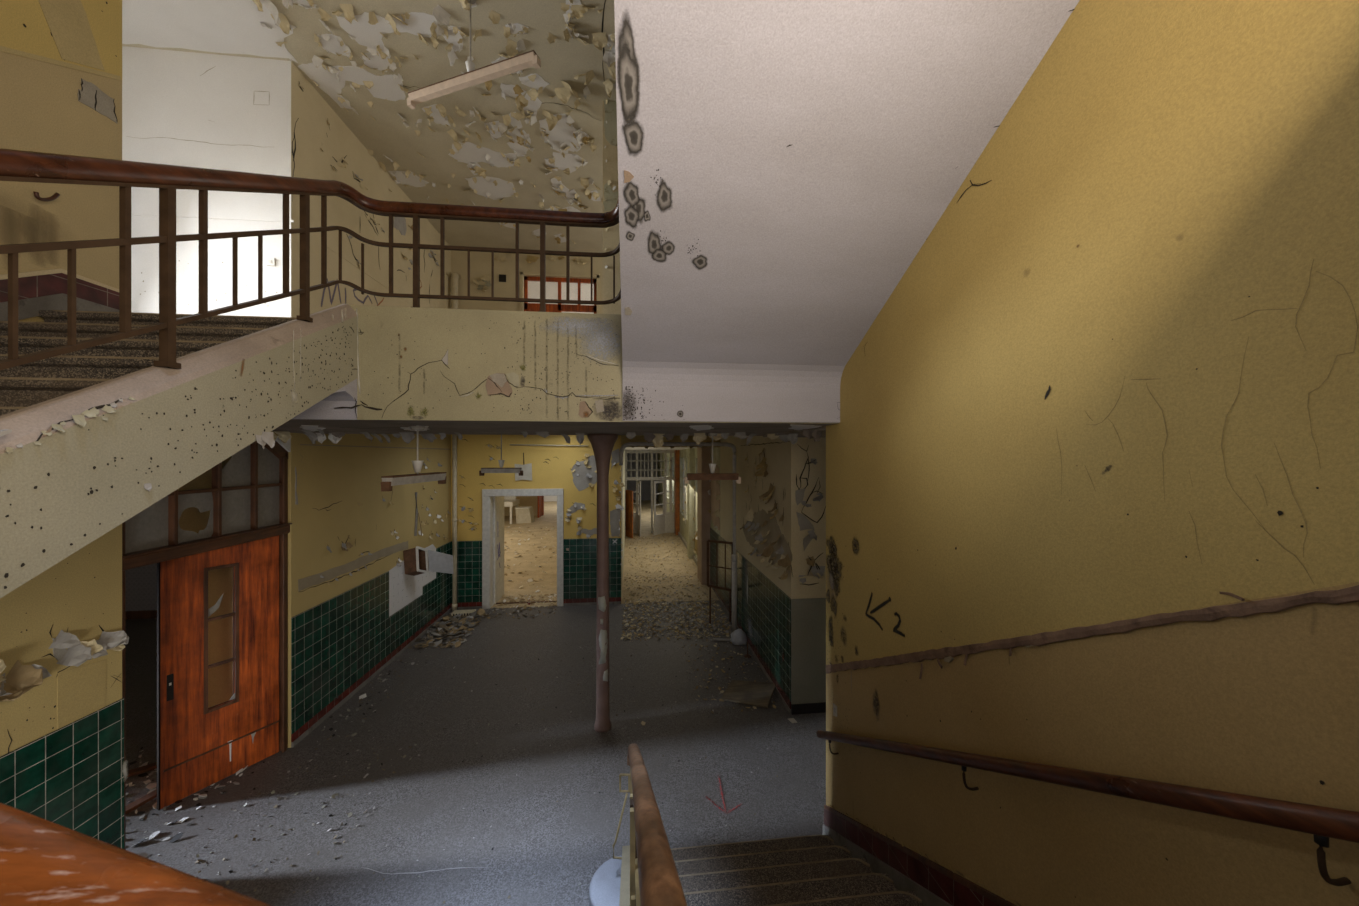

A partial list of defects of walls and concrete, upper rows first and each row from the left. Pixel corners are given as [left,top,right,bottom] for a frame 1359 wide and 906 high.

peeling [122,0,634,212]
leakage [618,15,643,155]
peeling [347,211,451,303]
peeling [494,229,608,268]
leakage [624,169,707,269]
peeling [6,396,136,454]
peeling [255,425,467,511]
crack [336,350,487,417]
crack [519,387,617,399]
peeling [521,401,826,593]
crack [1221,259,1358,584]
peeling [0,625,129,702]